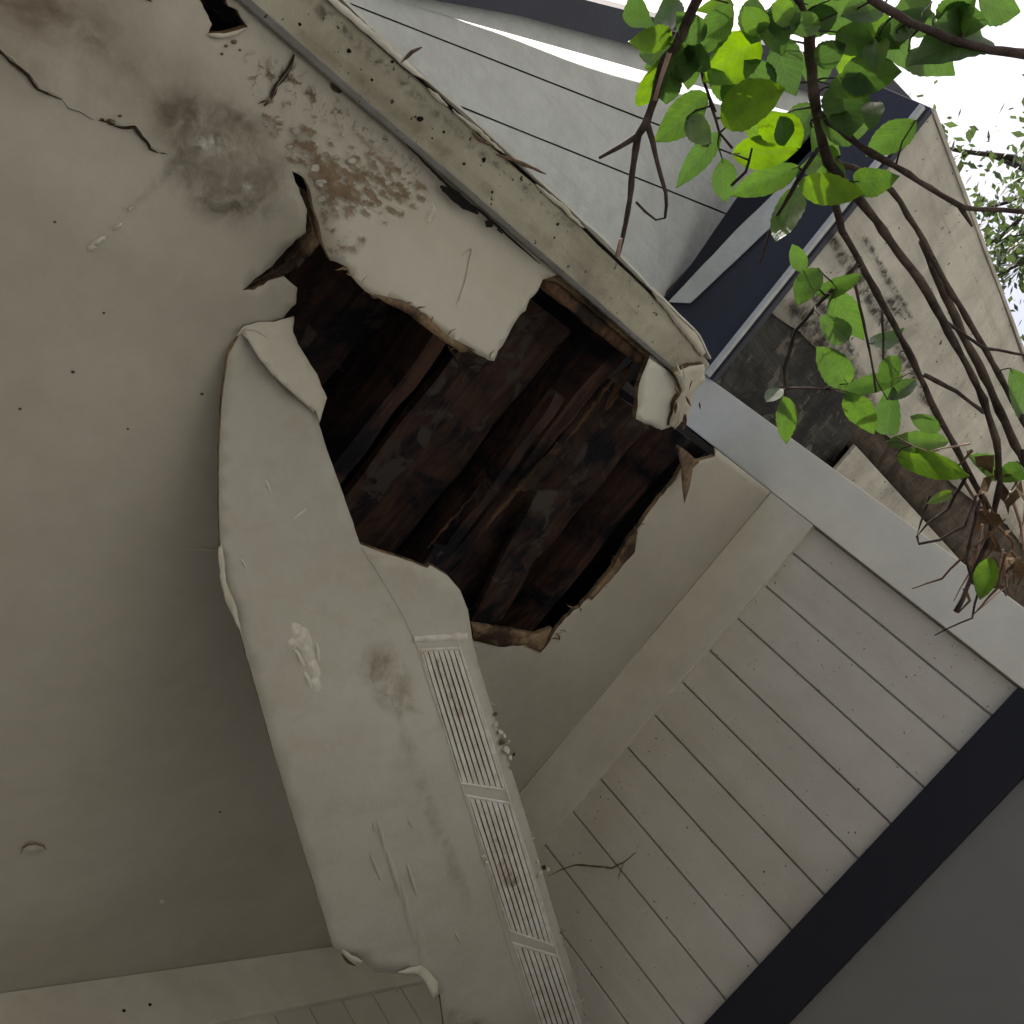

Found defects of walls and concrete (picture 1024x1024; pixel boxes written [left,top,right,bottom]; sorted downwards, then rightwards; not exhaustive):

crack [0,47,166,154]
water stain [253,65,341,115]
peeling [248,98,427,287]
peeling [374,294,475,352]
peeling [645,283,706,357]
peeling [237,316,327,423]
peeling [586,526,638,600]
peeling [470,621,552,653]